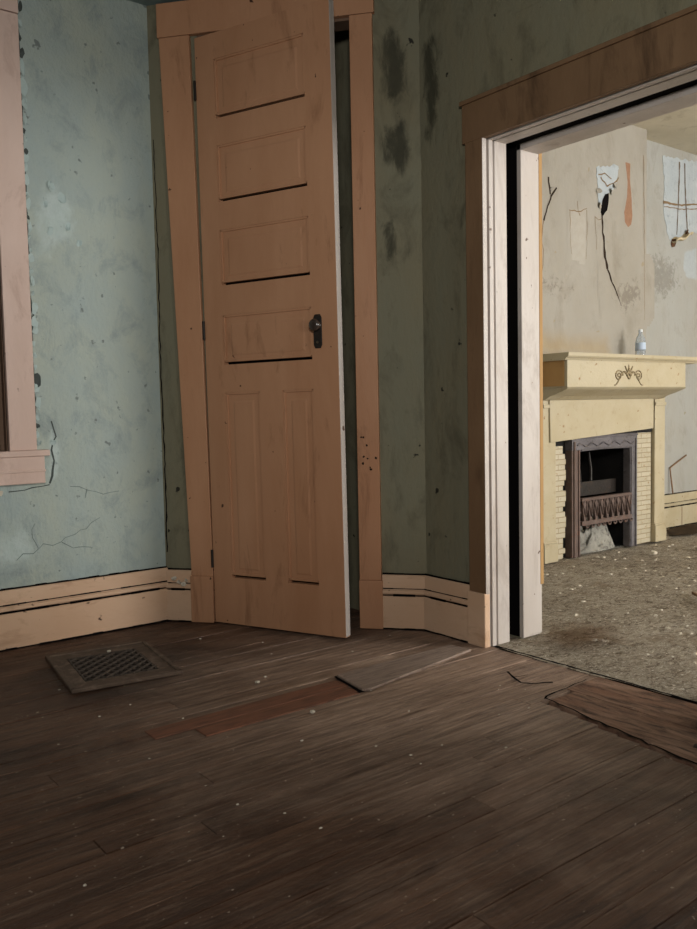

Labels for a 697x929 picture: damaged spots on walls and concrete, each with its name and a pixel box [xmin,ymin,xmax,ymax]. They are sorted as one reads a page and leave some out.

crack [542,177,557,270]
crack [595,213,621,304]
crack [17,517,100,560]